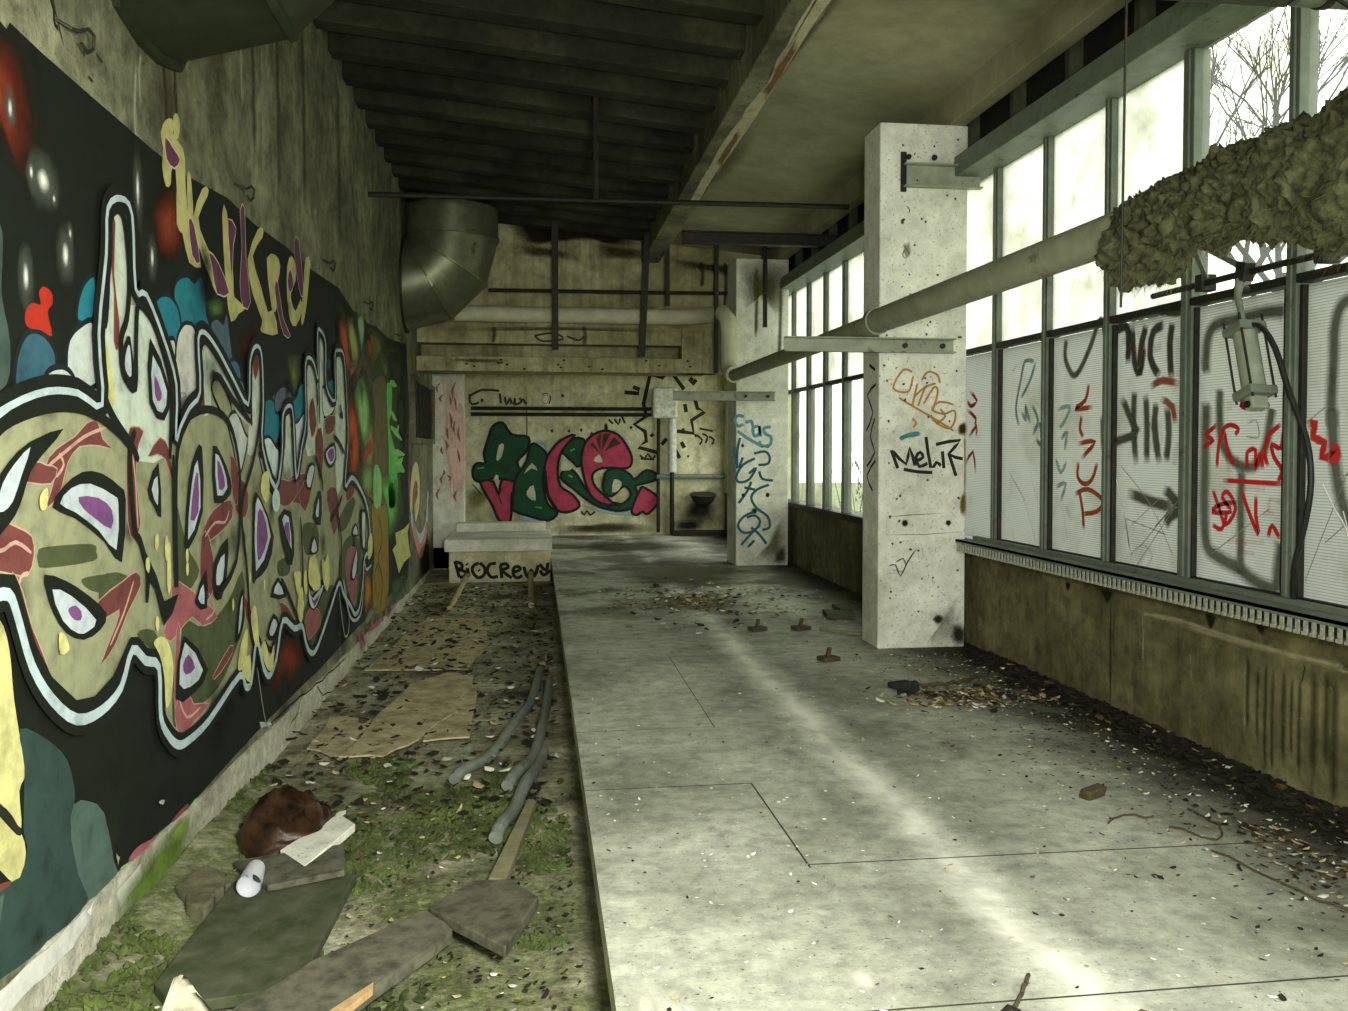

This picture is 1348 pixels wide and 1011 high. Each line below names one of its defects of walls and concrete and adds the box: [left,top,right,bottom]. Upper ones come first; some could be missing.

crack [50,0,63,42]
water stain [1142,612,1348,791]